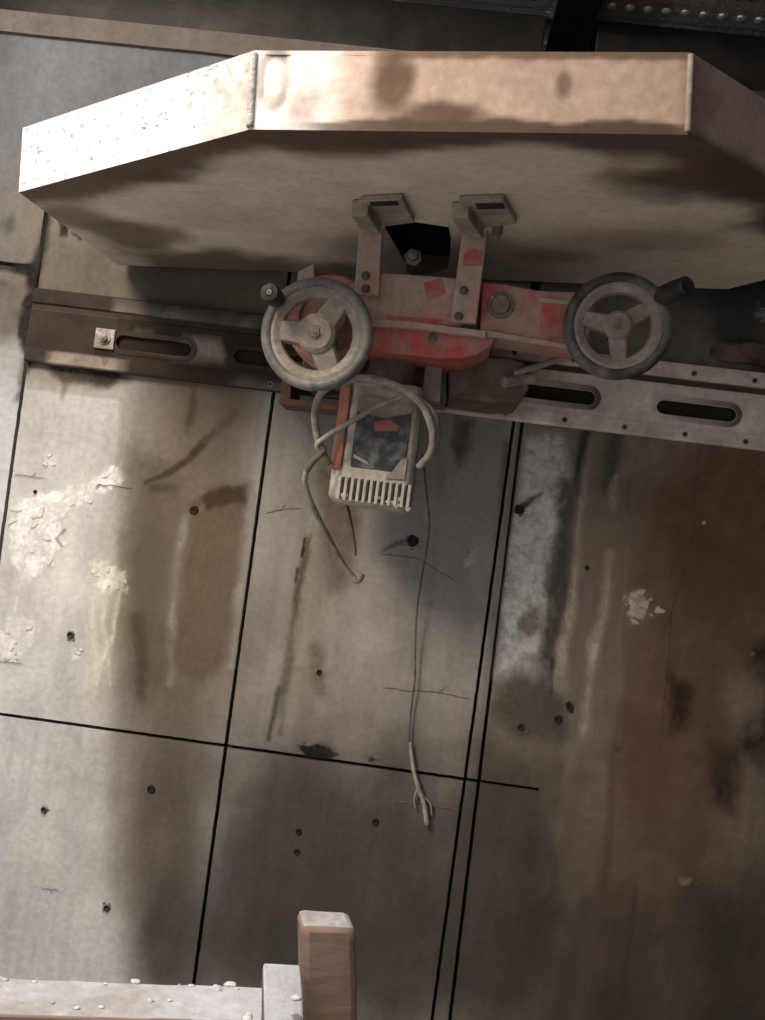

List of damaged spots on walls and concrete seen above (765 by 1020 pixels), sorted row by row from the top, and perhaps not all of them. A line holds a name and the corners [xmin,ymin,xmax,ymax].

damp [145,418,232,484]
peeling [0,465,128,664]
damp [496,430,631,752]
peeling [623,589,666,625]